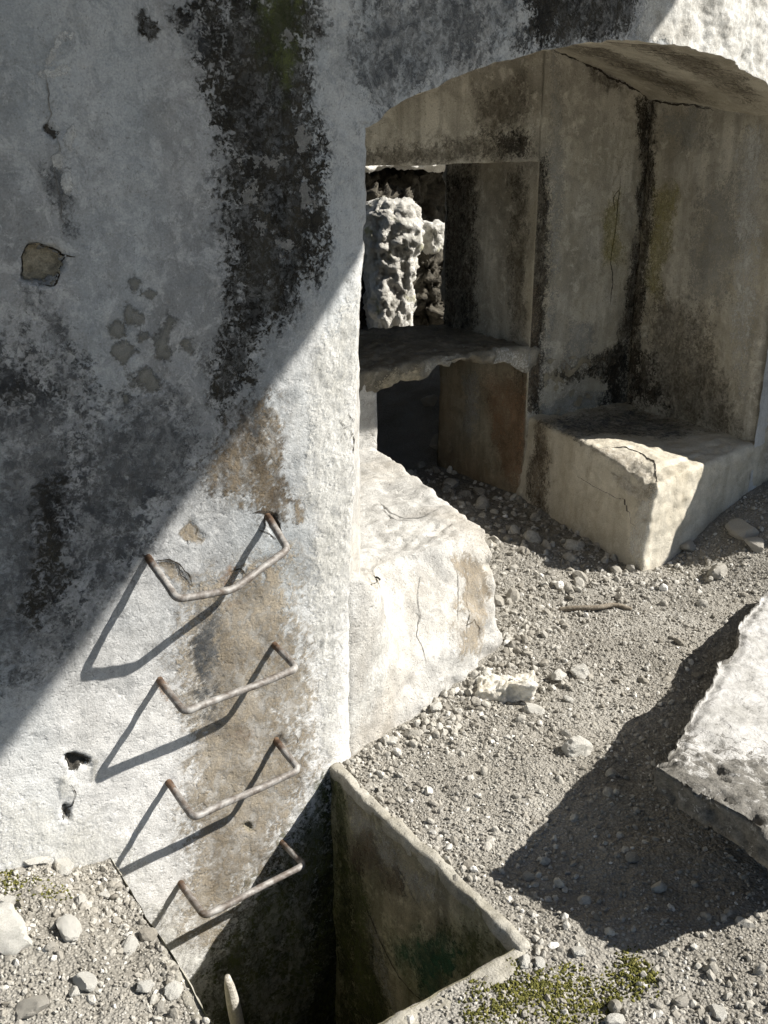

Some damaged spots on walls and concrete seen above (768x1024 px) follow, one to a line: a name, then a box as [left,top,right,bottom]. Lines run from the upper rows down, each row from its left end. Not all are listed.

crack [554,50,712,137]
spalling [21,243,74,286]
leakage [348,0,762,442]
leakage [0,0,333,697]
spalling [59,752,98,821]